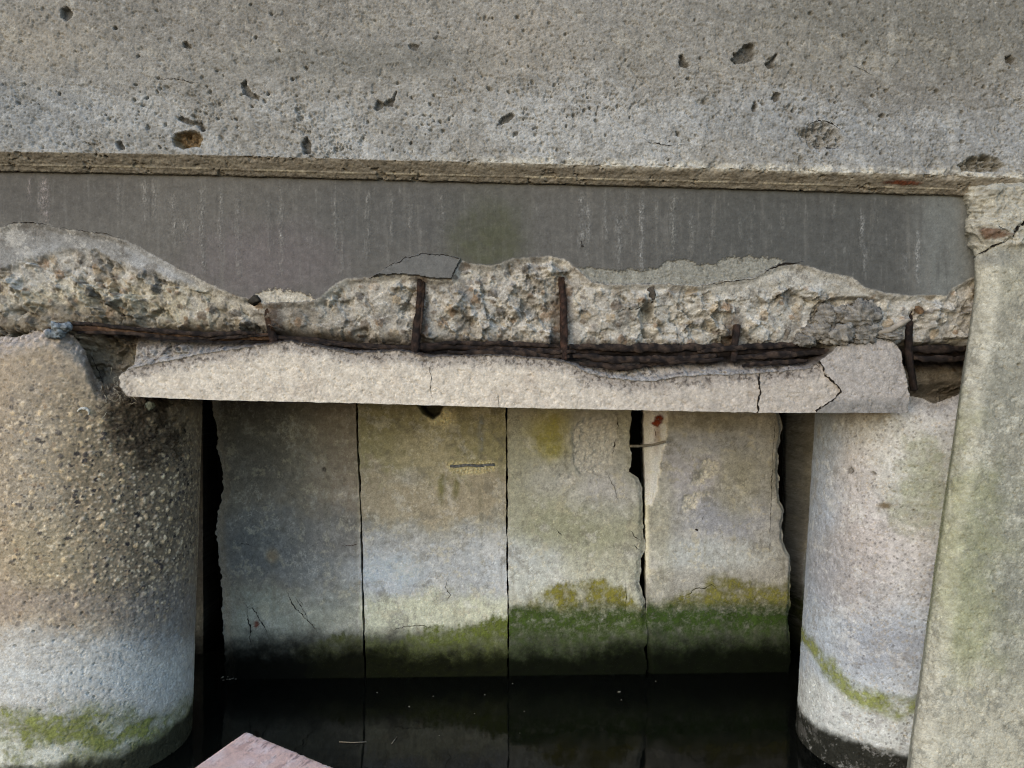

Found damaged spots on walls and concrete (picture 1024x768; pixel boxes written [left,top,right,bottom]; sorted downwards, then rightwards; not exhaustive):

crack [973,222,1024,258]
spalling [0,221,974,679]
crack [756,374,775,552]
crack [815,343,850,412]